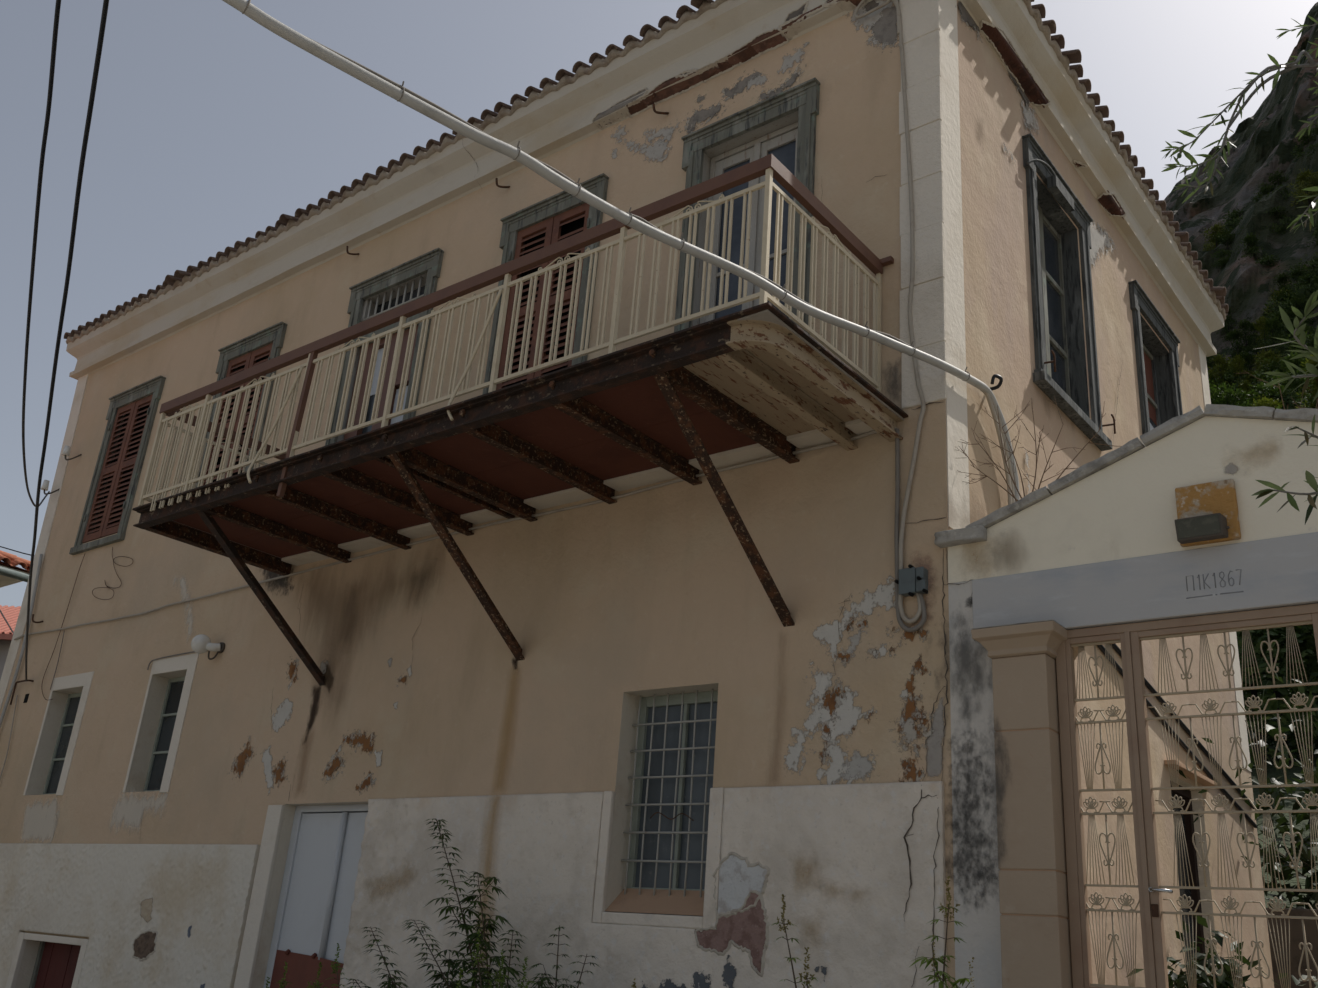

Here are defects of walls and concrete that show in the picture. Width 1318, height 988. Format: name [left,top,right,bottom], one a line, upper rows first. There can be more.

spalling [592,0,899,163]
peeling [322,730,382,793]
peeling [784,564,935,785]
crack [903,517,973,986]
damp [946,747,1003,903]
spalling [132,929,158,961]
flaking render [642,852,770,988]